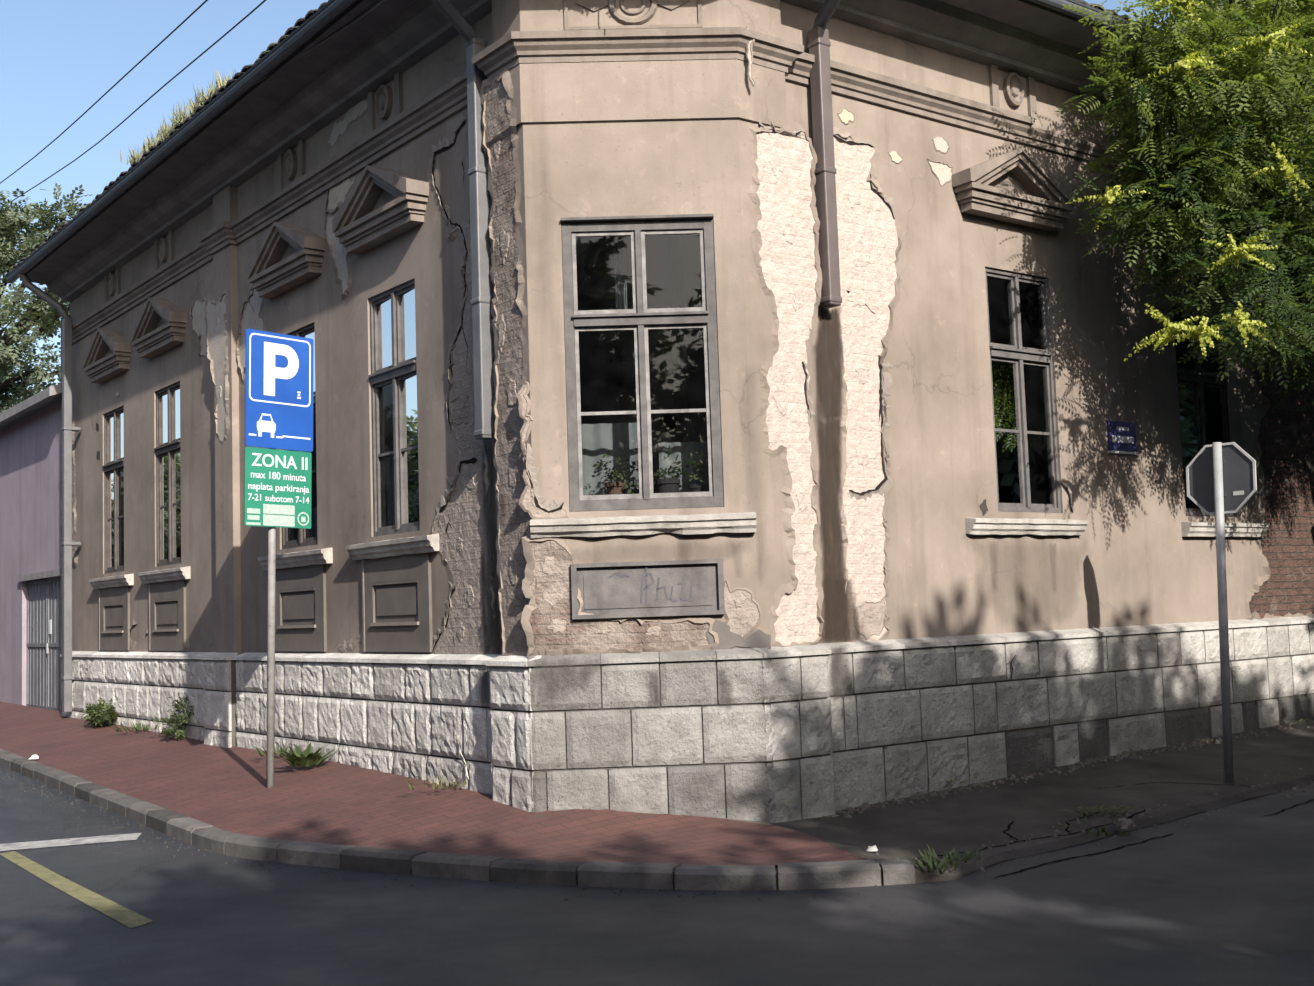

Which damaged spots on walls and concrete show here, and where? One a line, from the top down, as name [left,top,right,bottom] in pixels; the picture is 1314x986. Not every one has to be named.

spalling [191,283,266,444]
spalling [323,176,356,300]
crack [432,581,456,652]
crack [427,113,477,533]
spalling [429,68,824,659]
spalling [833,108,903,642]
spalling [927,136,953,187]
flaking render [1240,338,1314,620]